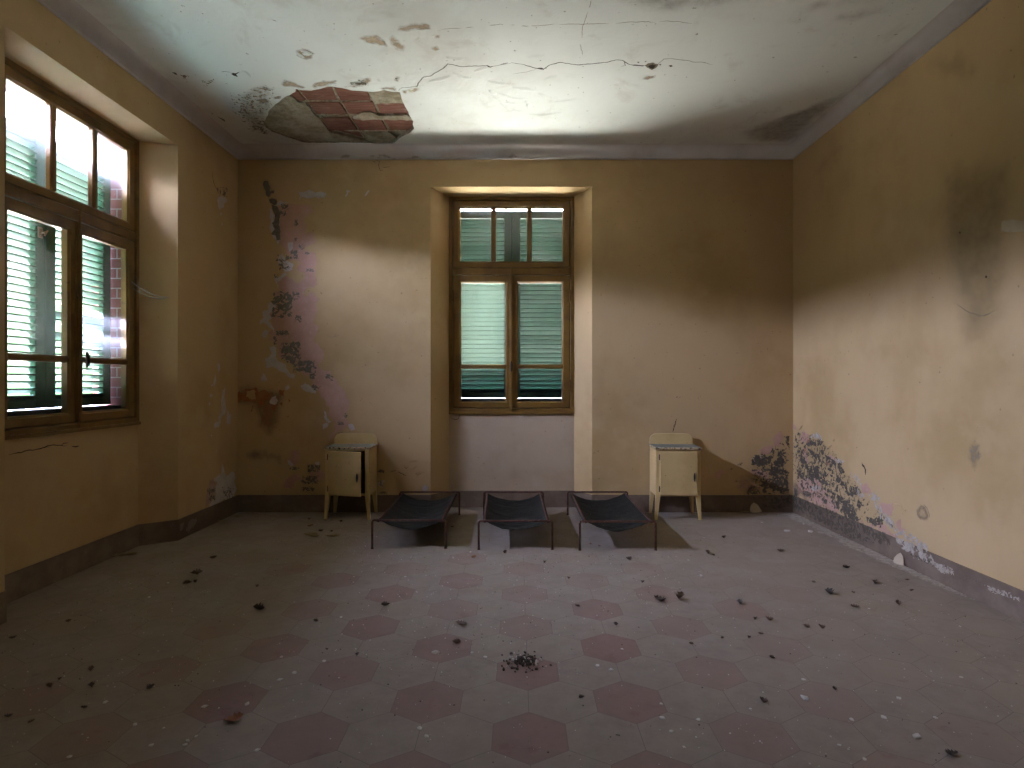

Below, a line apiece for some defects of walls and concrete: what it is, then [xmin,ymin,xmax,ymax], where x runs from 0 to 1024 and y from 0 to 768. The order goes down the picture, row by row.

crack [399,2,711,90]
flaking render [202,70,414,144]
peeling [260,181,355,442]
peeling [206,465,237,507]
damp [715,424,975,600]